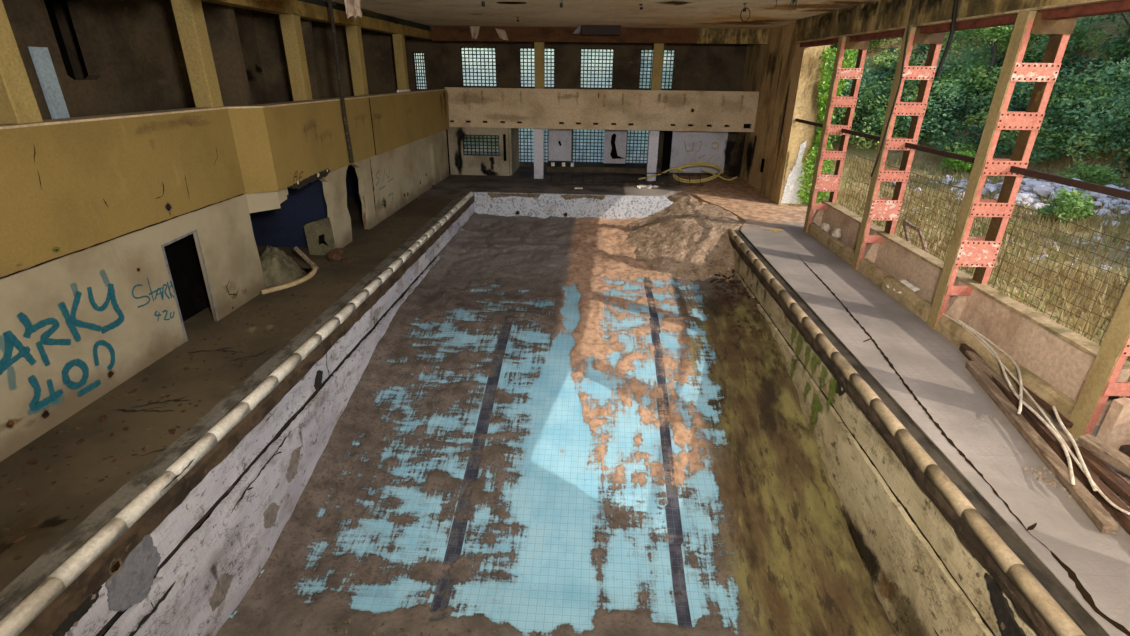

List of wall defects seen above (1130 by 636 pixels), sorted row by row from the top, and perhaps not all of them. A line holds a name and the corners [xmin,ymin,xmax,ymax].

water stain [701,0,906,26]
spalling [287,168,330,189]
spalling [308,370,323,392]
water stain [790,335,836,411]
crack [799,257,1130,636]
spalling [52,535,161,636]
spalling [976,572,1026,636]